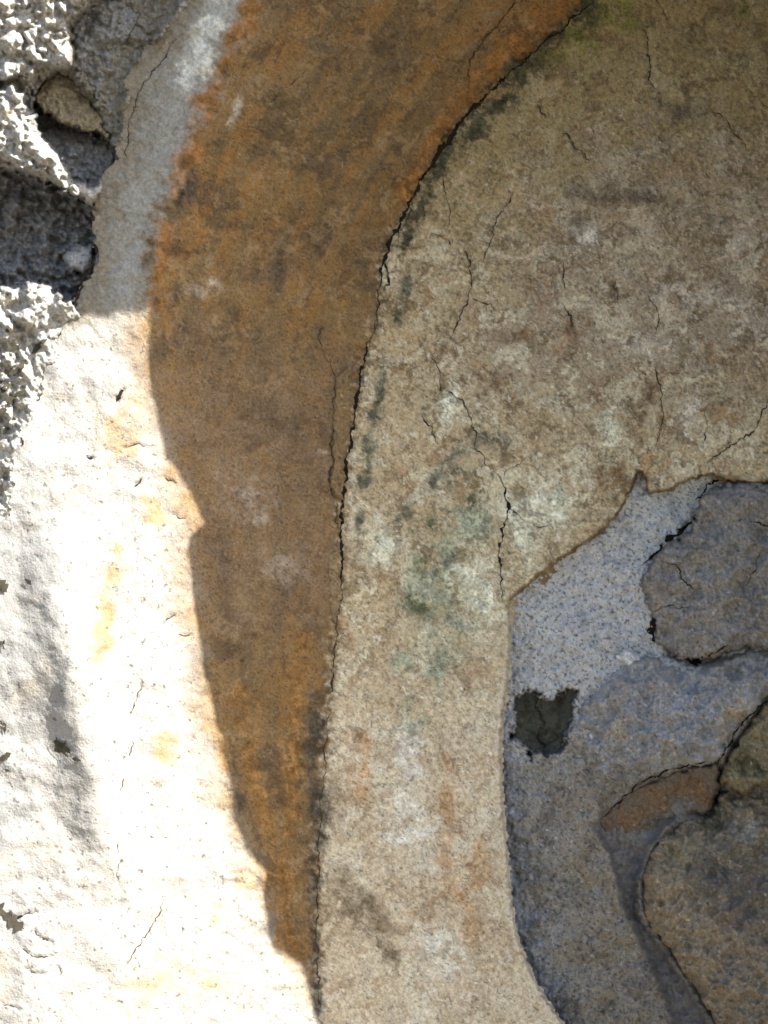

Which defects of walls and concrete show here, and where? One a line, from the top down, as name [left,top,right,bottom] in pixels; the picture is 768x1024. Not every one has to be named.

rust [161,0,271,189]
spalling [0,339,47,414]
rust [140,201,221,320]
rust [86,364,182,646]
crack [315,1,593,1019]
crack [641,401,768,642]
spalling [53,737,81,762]
rust [104,623,317,1024]
spalling [502,451,768,1024]
crack [683,645,728,666]